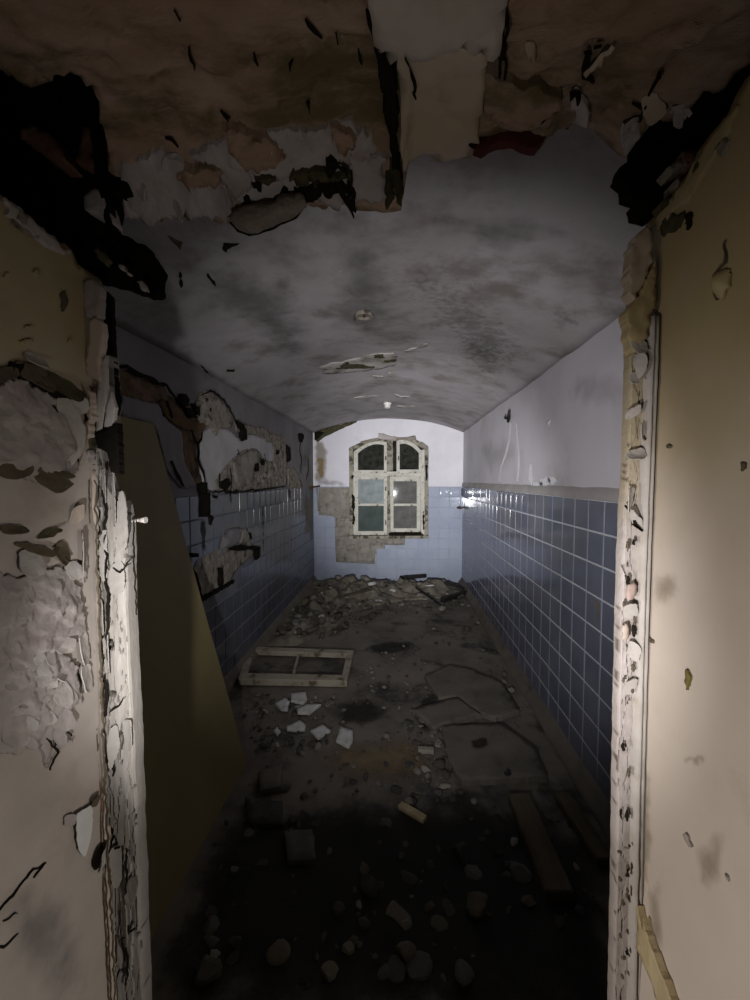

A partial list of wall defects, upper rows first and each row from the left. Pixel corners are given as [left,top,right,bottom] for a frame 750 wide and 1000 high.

peeling [2,101,387,301]
flaking render [469,119,547,159]
spalling [610,70,741,237]
peeling [0,324,90,493]
flaking render [119,364,291,494]
peeling [319,343,428,378]
peeling [319,487,405,564]
peeling [0,504,93,770]
peeling [621,576,655,704]
peeling [684,669,692,690]
peeling [64,793,102,857]
crack [0,862,46,949]